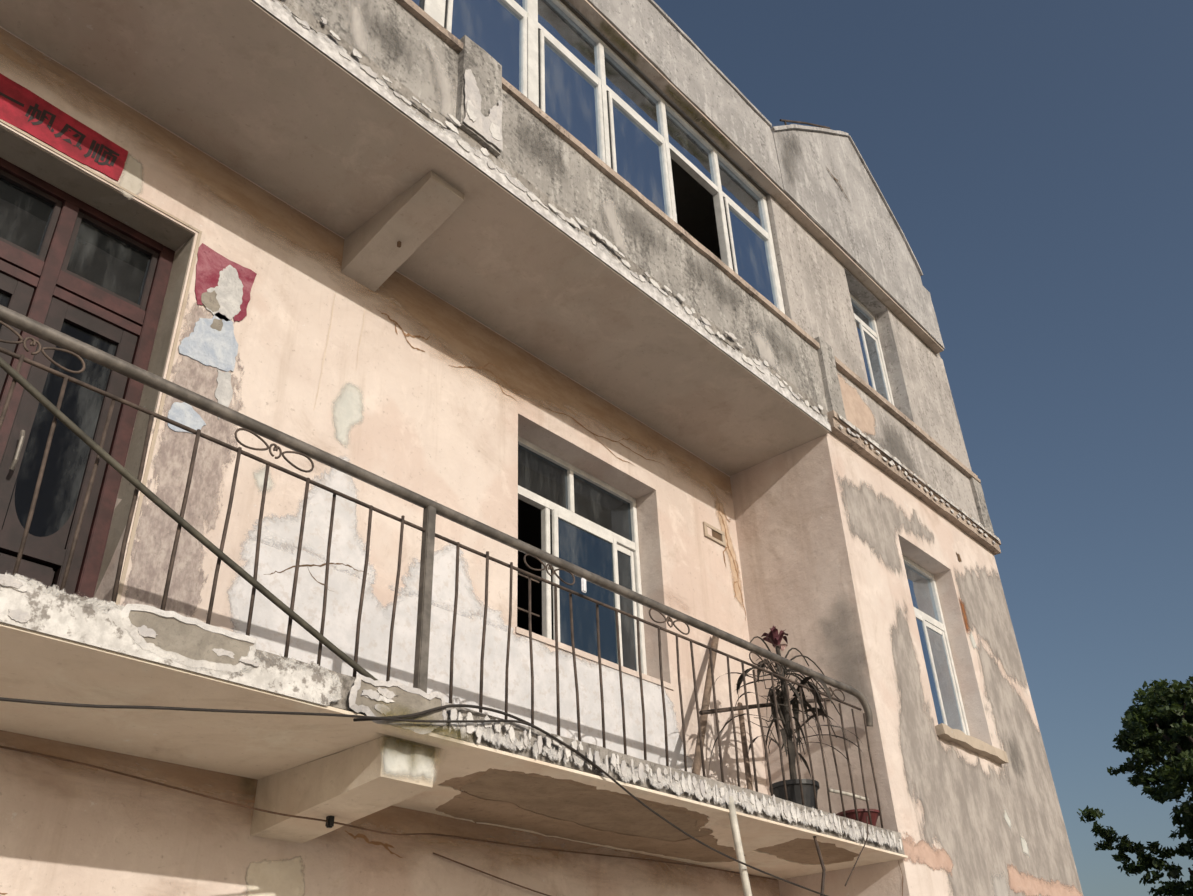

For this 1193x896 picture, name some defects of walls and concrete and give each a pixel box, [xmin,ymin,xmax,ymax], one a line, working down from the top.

water stain [429,47,455,120]
water stain [0,27,345,268]
water stain [603,202,627,254]
peeling [254,0,1000,544]
crack [356,306,430,369]
water stain [367,271,732,494]
crack [449,362,664,465]
water stain [752,333,779,371]
peeling [838,476,934,573]
peeling [0,384,902,866]
peeling [891,552,1083,896]
peeling [245,856,305,896]